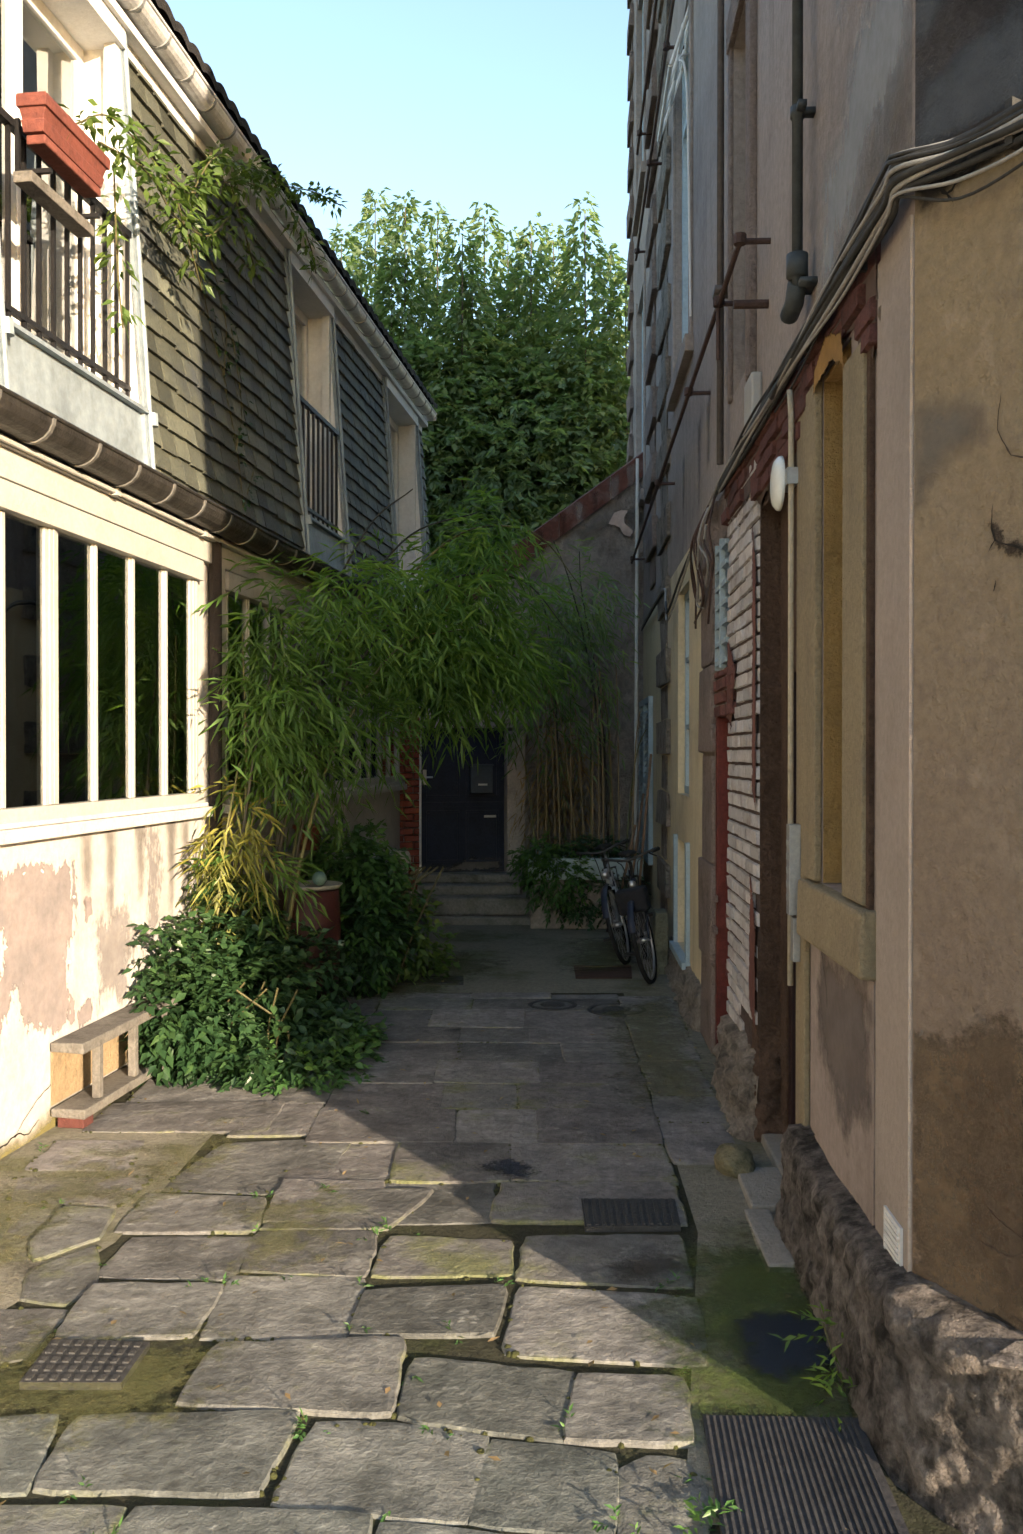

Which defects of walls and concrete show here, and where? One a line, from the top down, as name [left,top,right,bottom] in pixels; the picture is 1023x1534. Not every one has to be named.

leakage [824,0,1023,273]
crack [997,397,1023,458]
crack [988,506,1023,591]
peeling [0,859,93,1039]
crack [0,1085,51,1149]